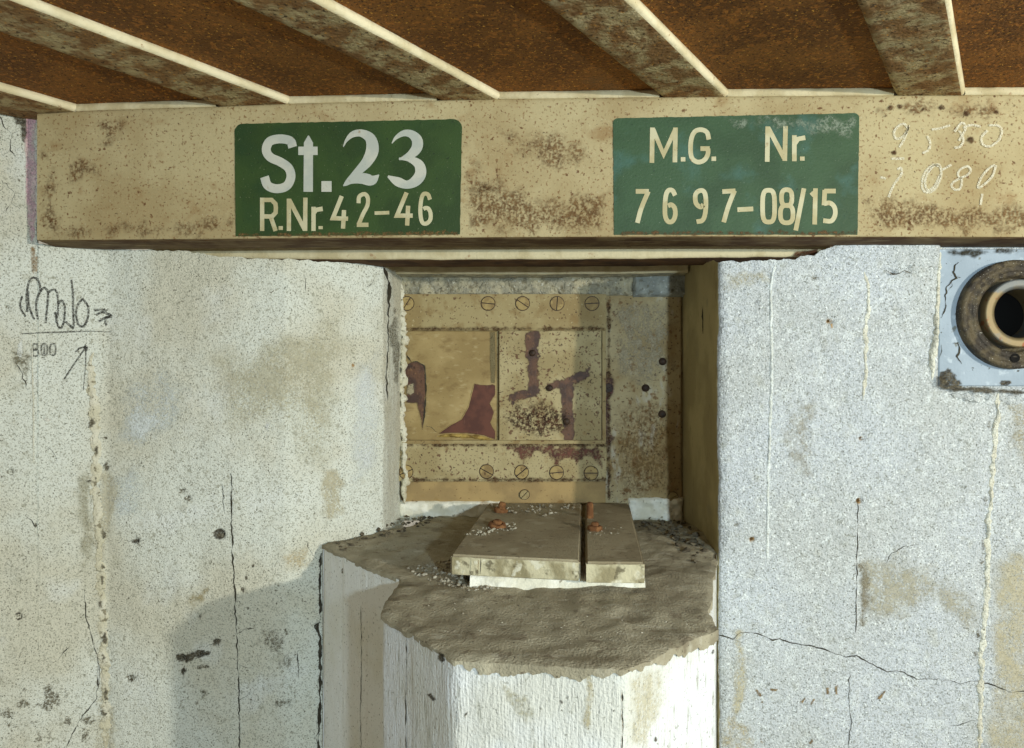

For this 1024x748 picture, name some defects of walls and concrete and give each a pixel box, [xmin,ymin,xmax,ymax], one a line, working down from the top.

corrosion [508,331,590,440]
crack [222,473,254,748]
crack [853,503,861,627]
crack [719,632,1024,746]